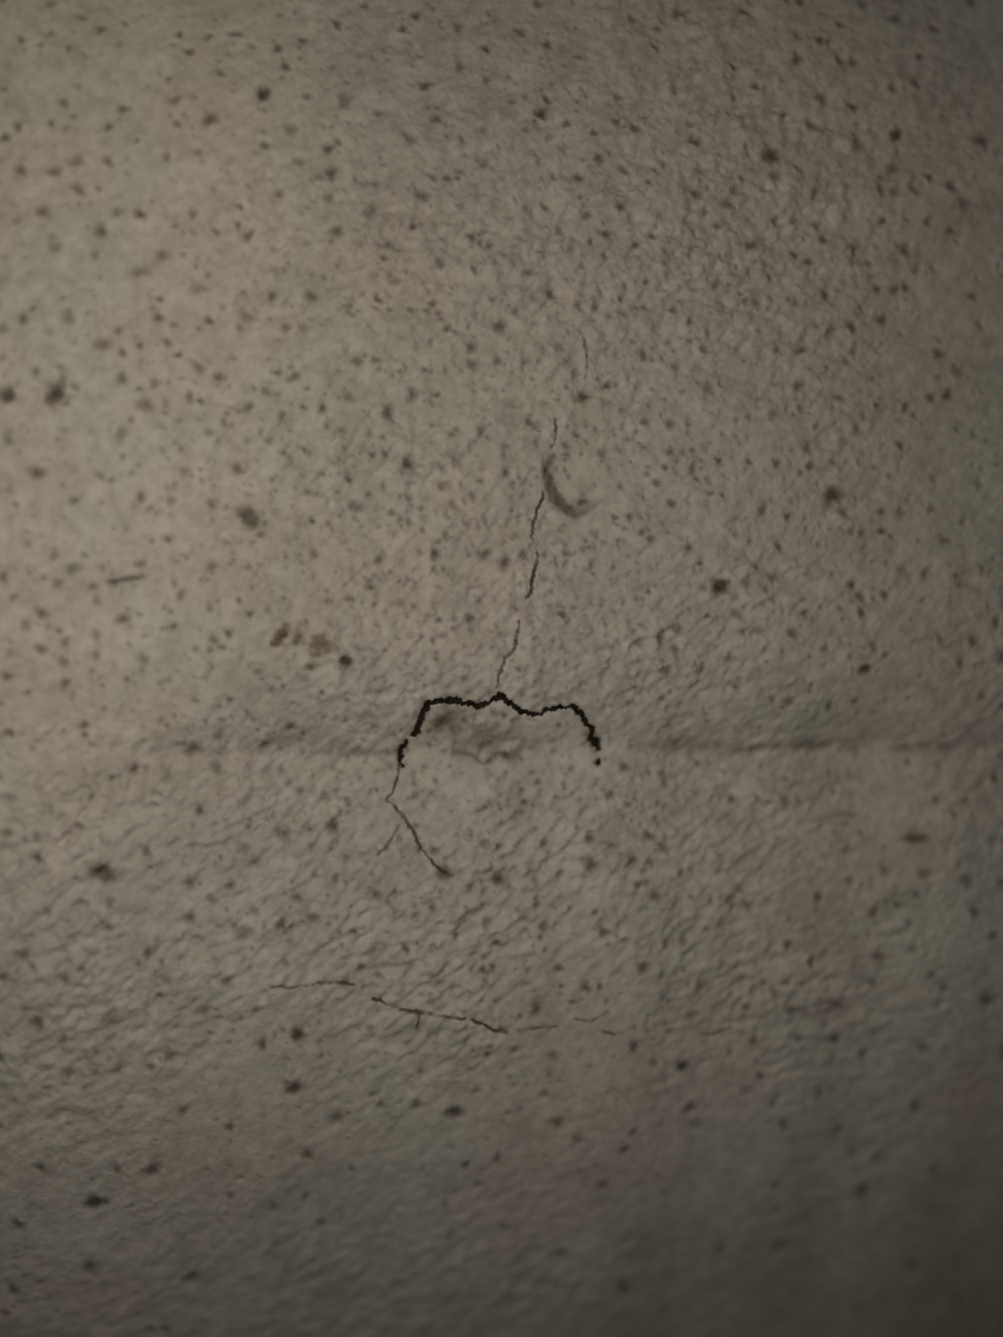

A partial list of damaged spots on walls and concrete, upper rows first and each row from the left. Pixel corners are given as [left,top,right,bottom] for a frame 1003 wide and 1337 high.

crack [392,494,601,873]